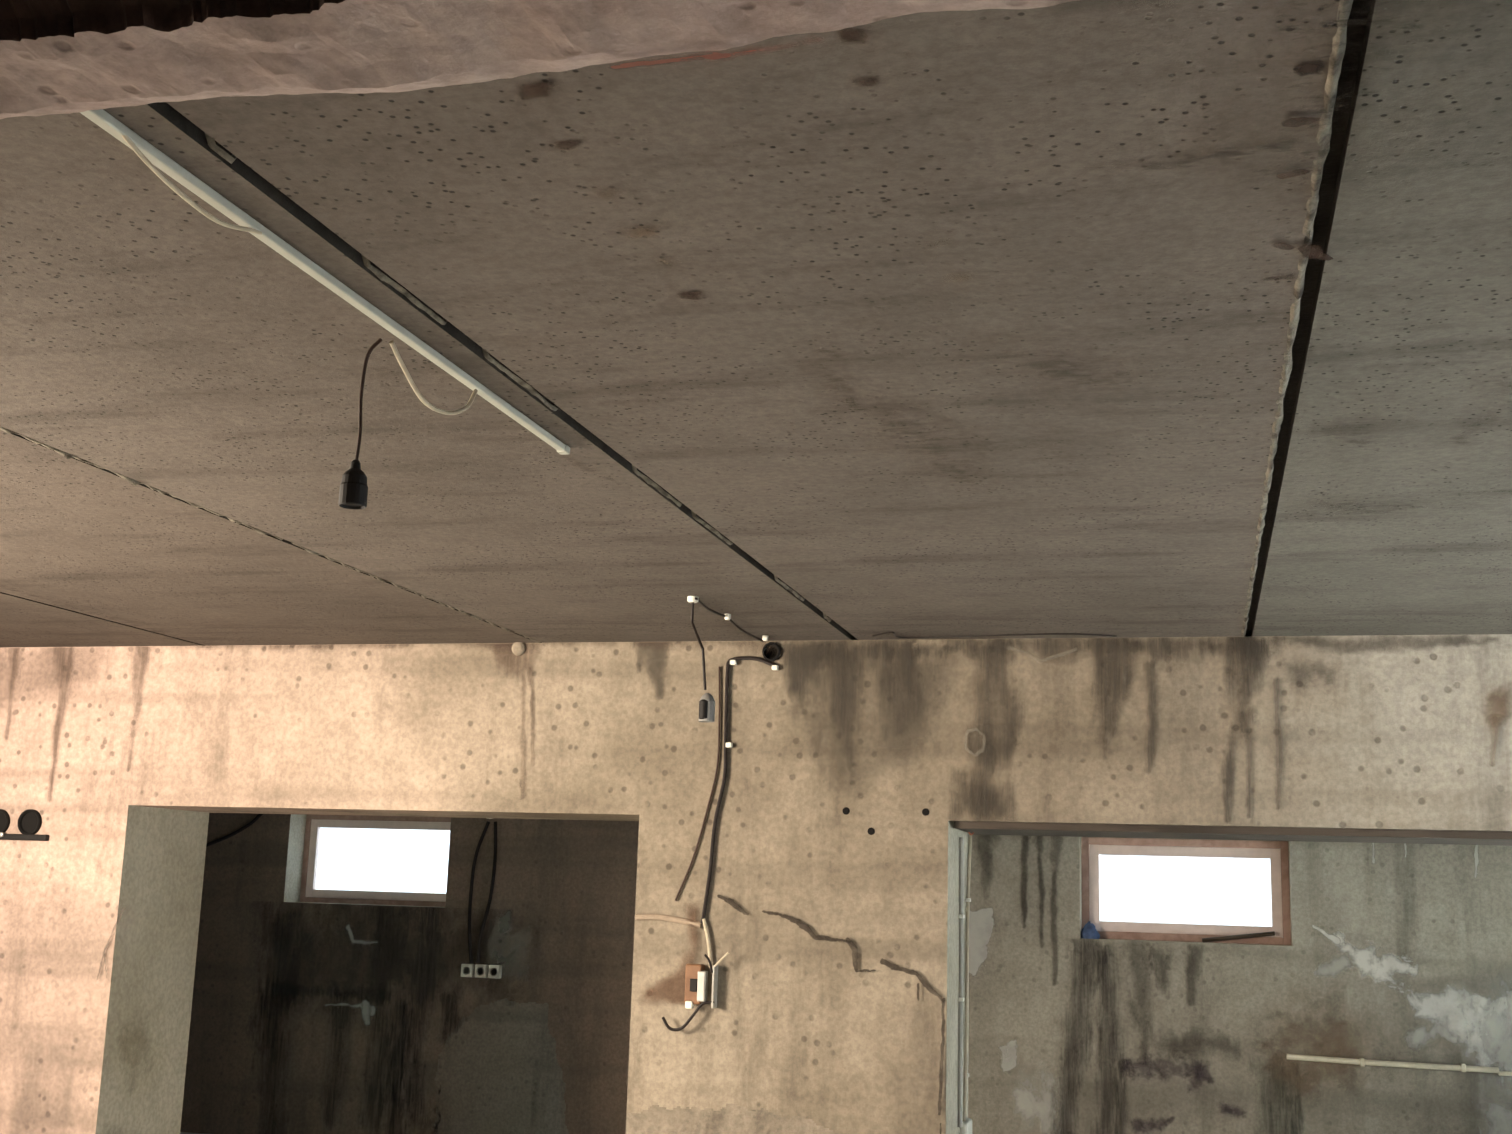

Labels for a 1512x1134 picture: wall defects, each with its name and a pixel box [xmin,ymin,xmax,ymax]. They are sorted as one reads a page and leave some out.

damp [788,641,928,745]
damp [947,636,1327,822]
damp [1418,636,1473,646]
damp [1021,836,1055,922]
damp [261,904,501,1134]
crack [717,895,945,1134]
damp [1061,944,1213,1134]
damp [1264,1017,1358,1134]